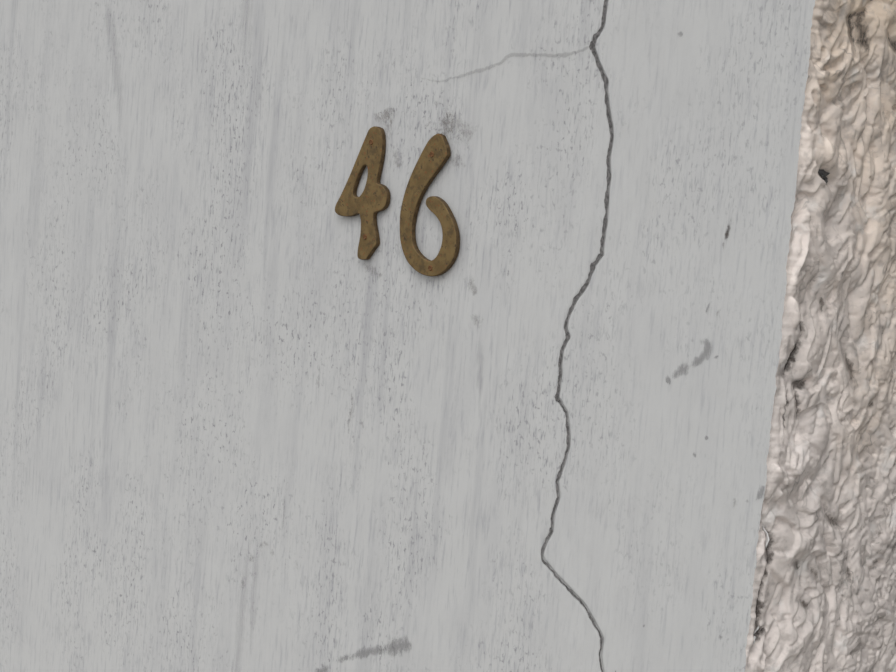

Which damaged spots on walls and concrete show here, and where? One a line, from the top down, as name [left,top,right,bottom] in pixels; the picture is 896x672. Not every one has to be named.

crack [541,0,616,672]